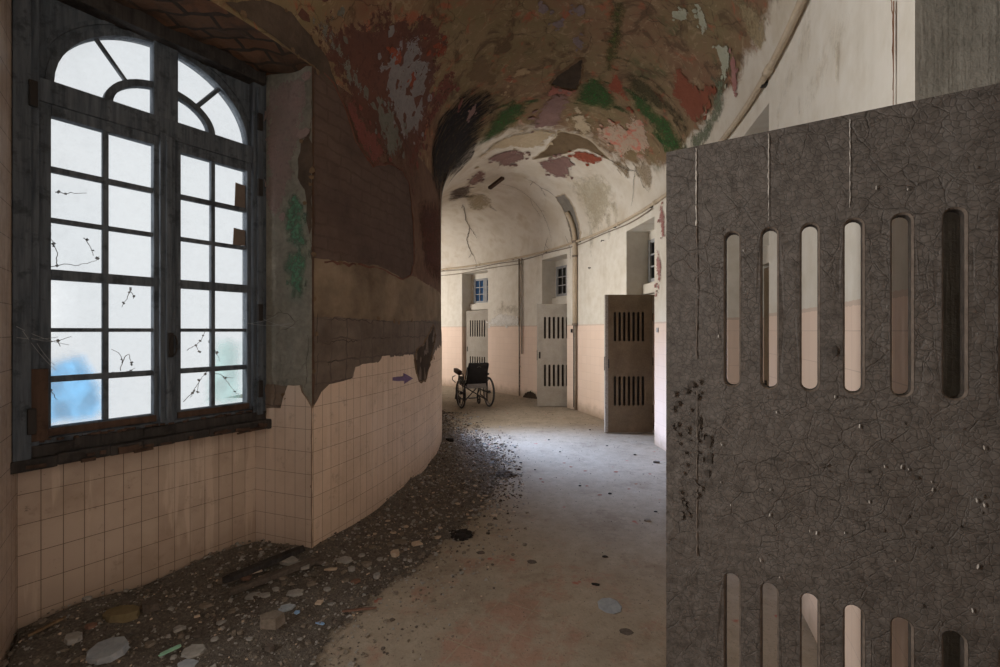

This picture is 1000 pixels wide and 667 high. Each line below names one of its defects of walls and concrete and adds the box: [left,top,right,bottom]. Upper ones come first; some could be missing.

peeling [225,0,477,195]
peeling [467,57,650,187]
peeling [672,4,707,34]
peeling [672,45,738,123]
flaking render [298,99,442,405]
flaking render [555,193,582,242]